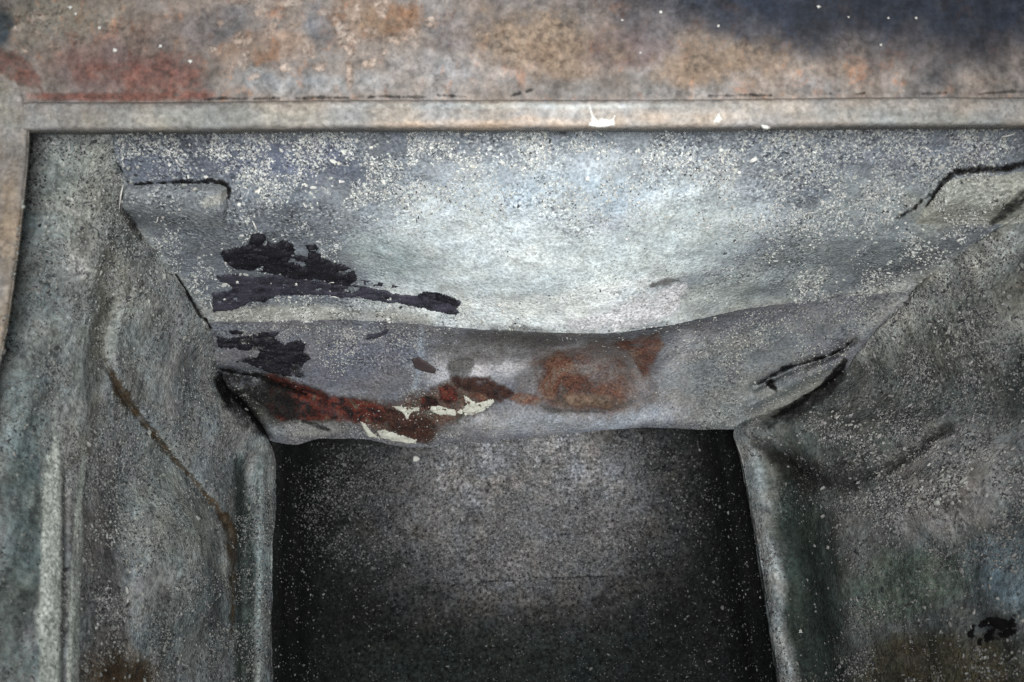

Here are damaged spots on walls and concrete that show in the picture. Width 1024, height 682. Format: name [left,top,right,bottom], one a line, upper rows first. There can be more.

crack [116,162,231,199]
crack [897,161,1024,218]
peeling [212,233,461,315]
peeling [214,330,311,378]
peeling [367,329,389,339]
peeling [412,357,436,373]
peeling [392,396,494,419]
rust [265,334,663,443]
crack [758,340,853,418]
peeling [360,421,417,444]
rust [107,368,237,633]
spalling [967,614,1017,646]